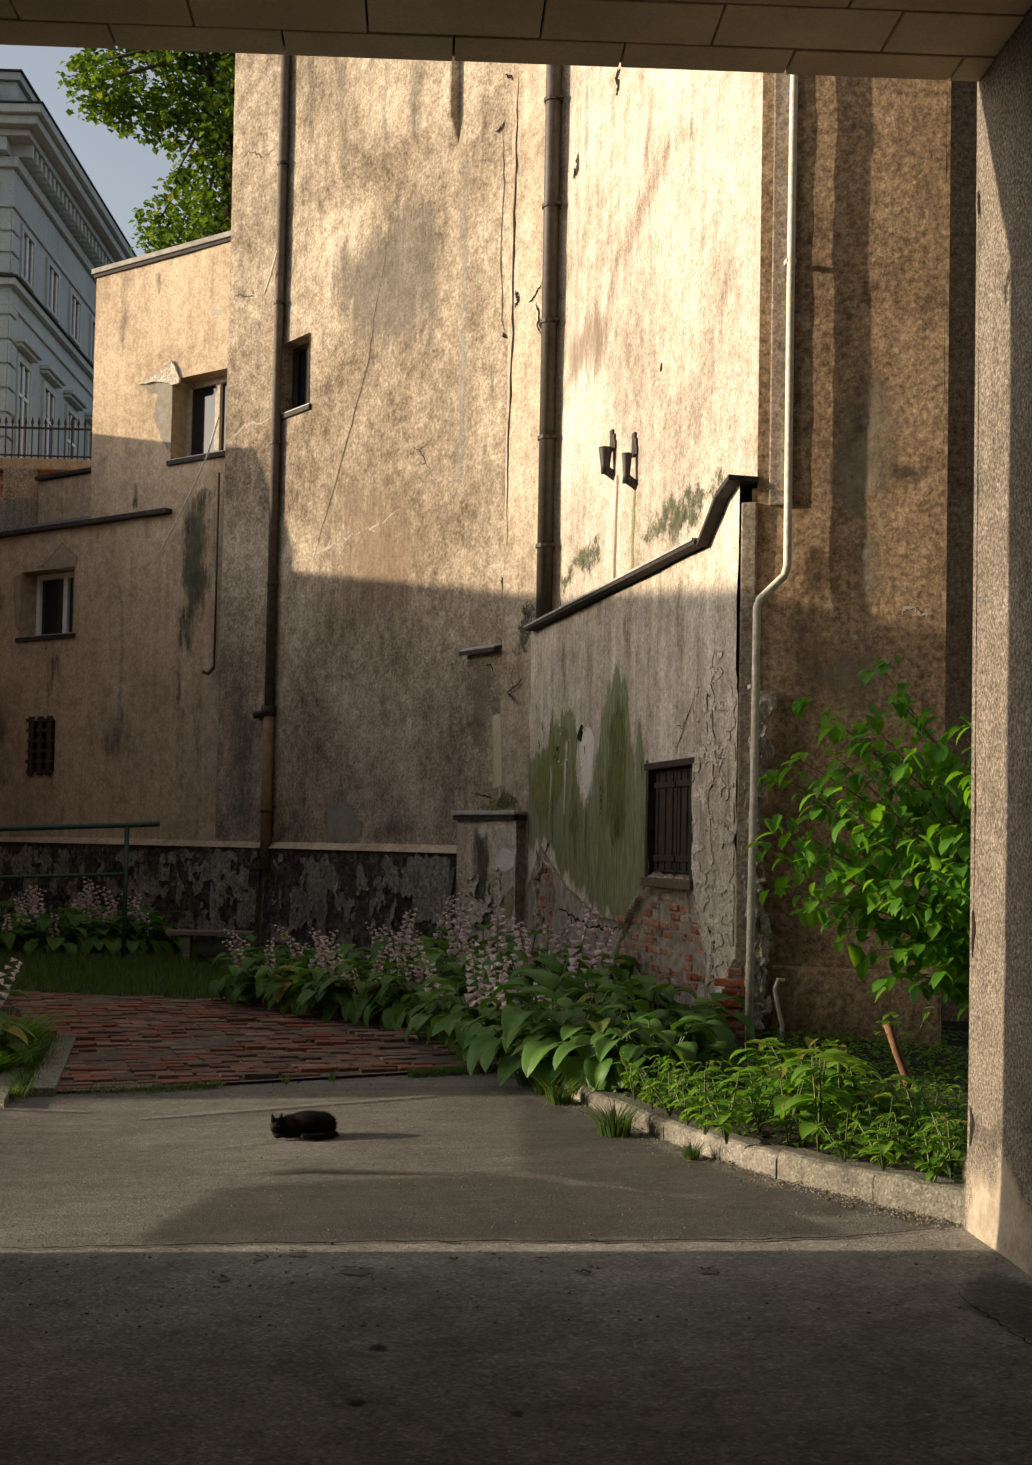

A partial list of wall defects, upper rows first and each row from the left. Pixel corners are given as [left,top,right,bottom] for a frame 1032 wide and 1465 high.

damp [179,491,210,652]
crack [307,204,394,579]
flaking render [0,645,777,1039]
crack [495,73,541,592]
damp [532,696,642,872]
crack [673,624,724,884]